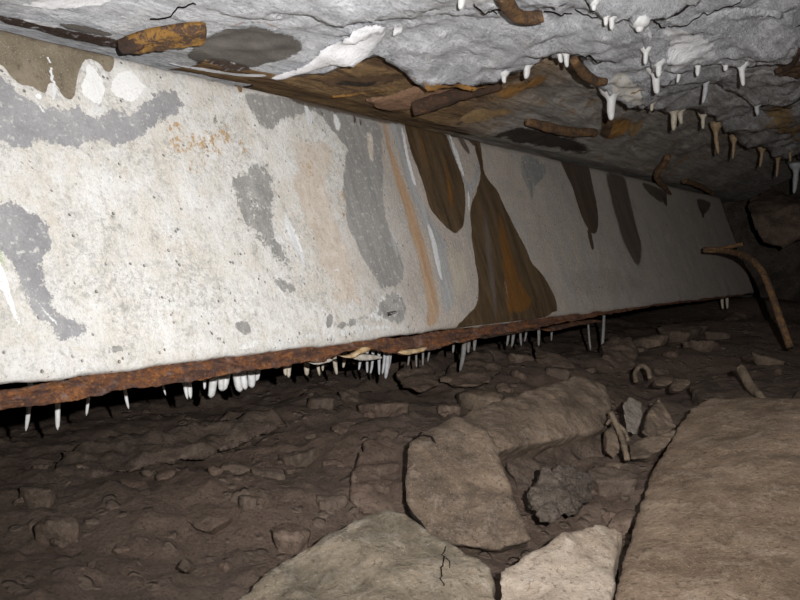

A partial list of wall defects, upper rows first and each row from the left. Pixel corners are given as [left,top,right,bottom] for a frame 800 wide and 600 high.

leakage [0,15,147,113]
crack [150,2,196,20]
leakage [170,21,410,87]
spalling [169,0,800,213]
peeling [231,156,292,270]
peeling [274,278,295,296]
leakage [224,149,406,350]
corrosion [382,122,439,328]
leakage [288,97,557,328]
leakage [491,126,598,250]
corrosion [306,346,383,365]
corrosion [398,347,427,355]